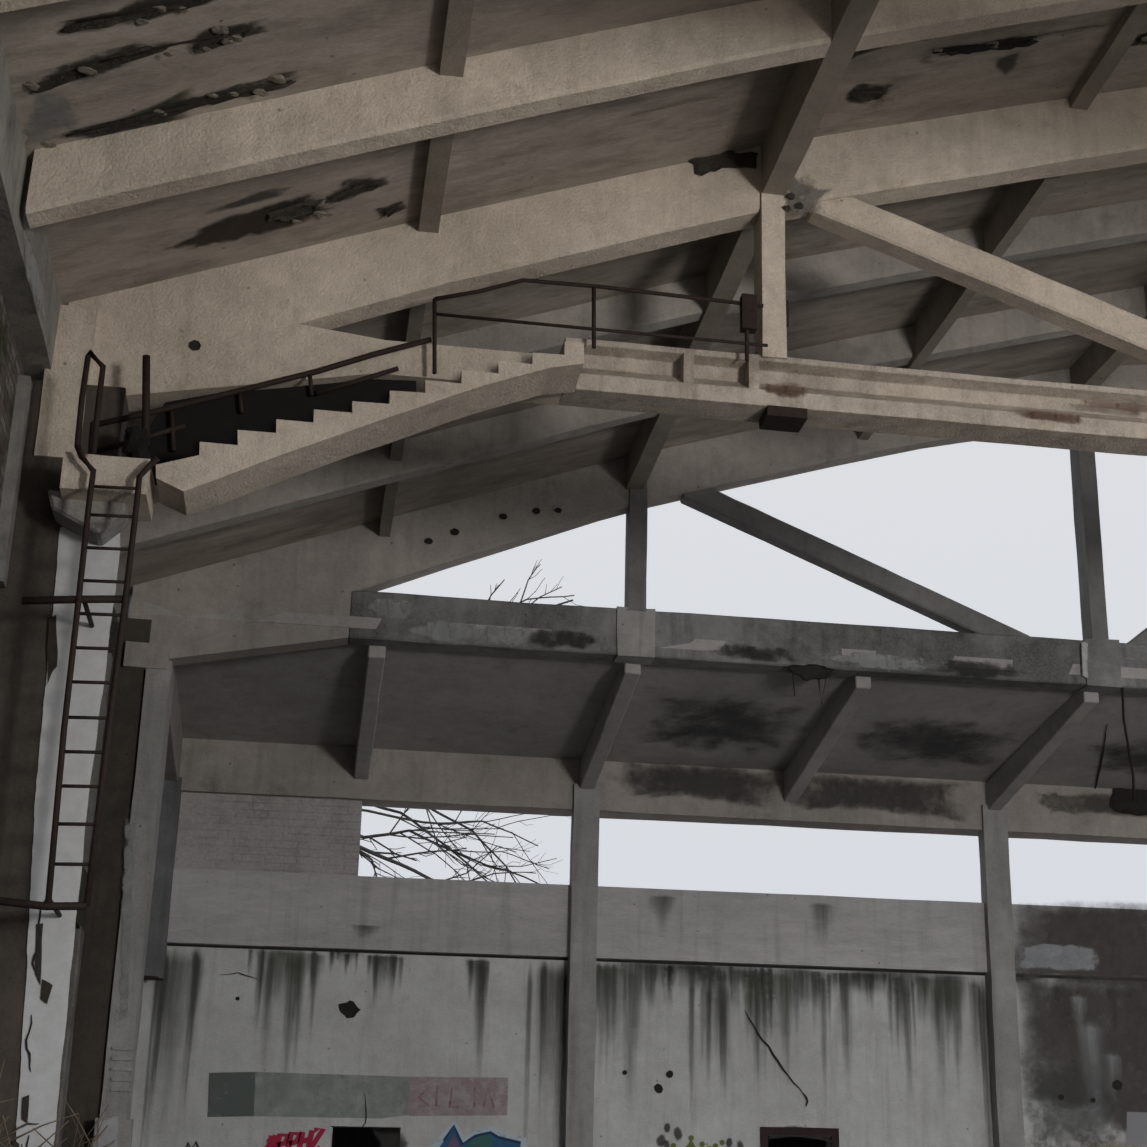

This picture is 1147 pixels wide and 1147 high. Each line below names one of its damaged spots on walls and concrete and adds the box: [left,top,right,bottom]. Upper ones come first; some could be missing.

spalling [60,0,213,34]
spalling [22,23,264,93]
spalling [42,72,296,148]
spalling [688,150,758,176]
rust [1022,401,1147,423]
water stain [630,764,772,803]
crack [1094,724,1108,789]
spalling [1109,788,1147,816]
water stain [528,966,567,1032]
crack [745,1010,808,1106]
water stain [596,964,958,1030]
water stain [1016,904,1147,1147]